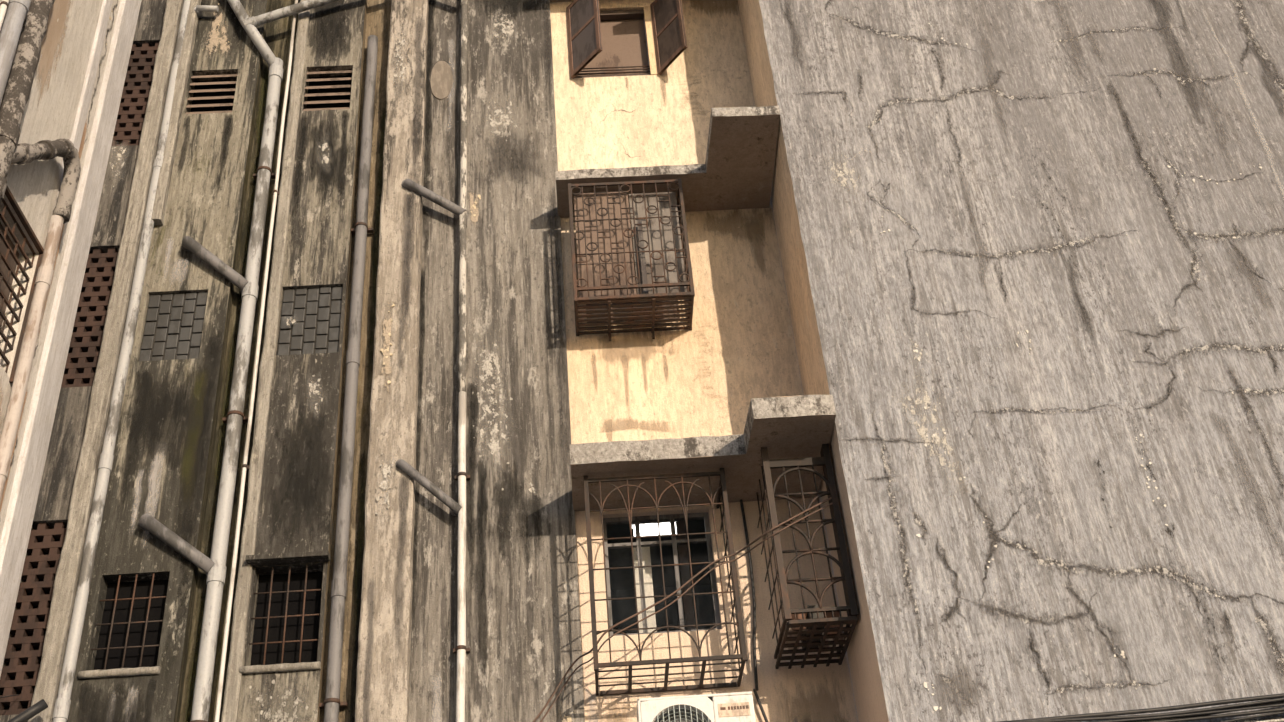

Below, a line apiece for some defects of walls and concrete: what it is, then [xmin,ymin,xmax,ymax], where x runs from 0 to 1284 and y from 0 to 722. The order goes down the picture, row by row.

leakage [217,115,233,185]
leakage [239,162,259,317]
leakage [292,110,349,223]
leakage [409,0,436,246]
crack [806,0,1045,159]
crack [871,183,1127,315]
crack [1118,0,1284,102]
crack [1126,146,1284,495]
leakage [400,269,425,614]
leakage [122,331,224,722]
crack [852,425,1284,699]
crack [923,661,962,712]